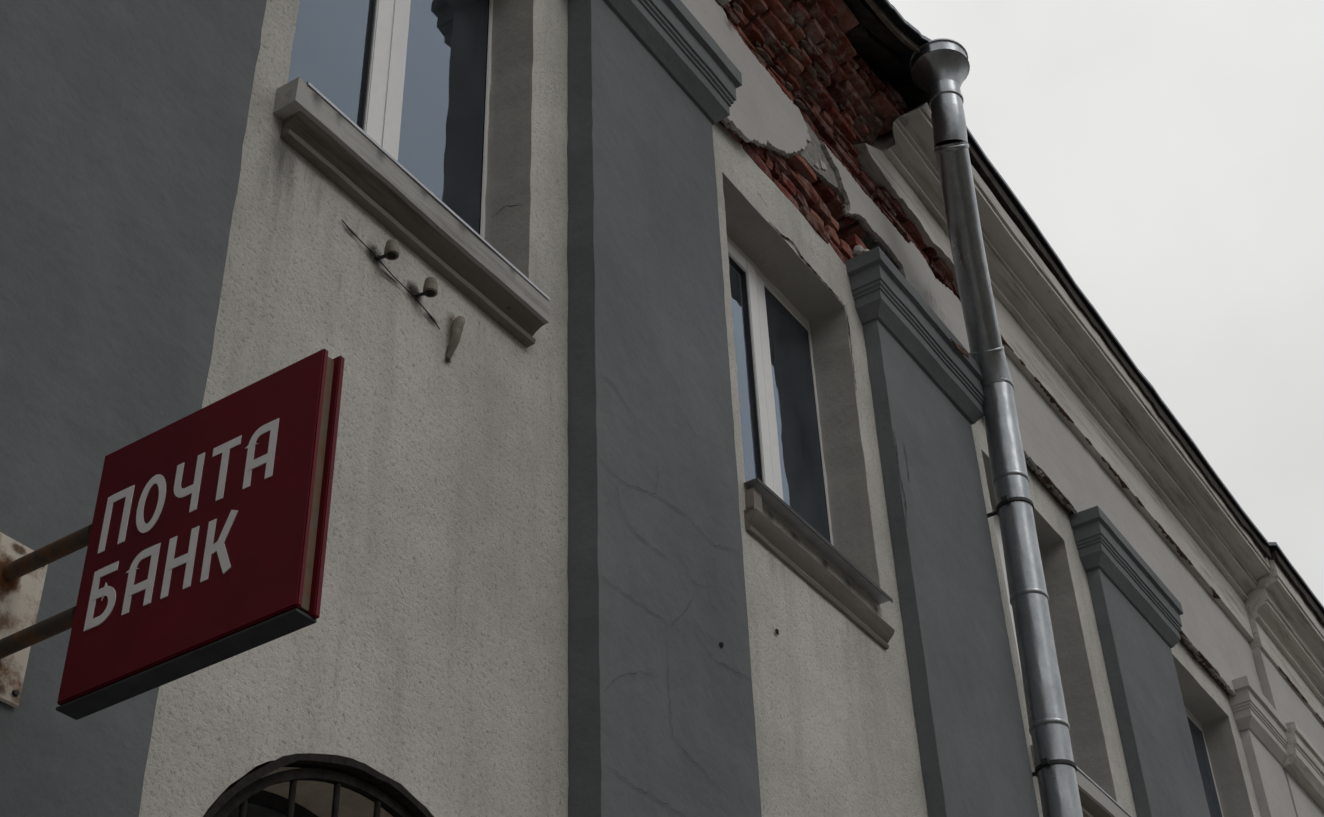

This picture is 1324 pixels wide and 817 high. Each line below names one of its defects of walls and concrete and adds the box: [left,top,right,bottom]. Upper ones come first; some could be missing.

spalling [719,0,960,299]